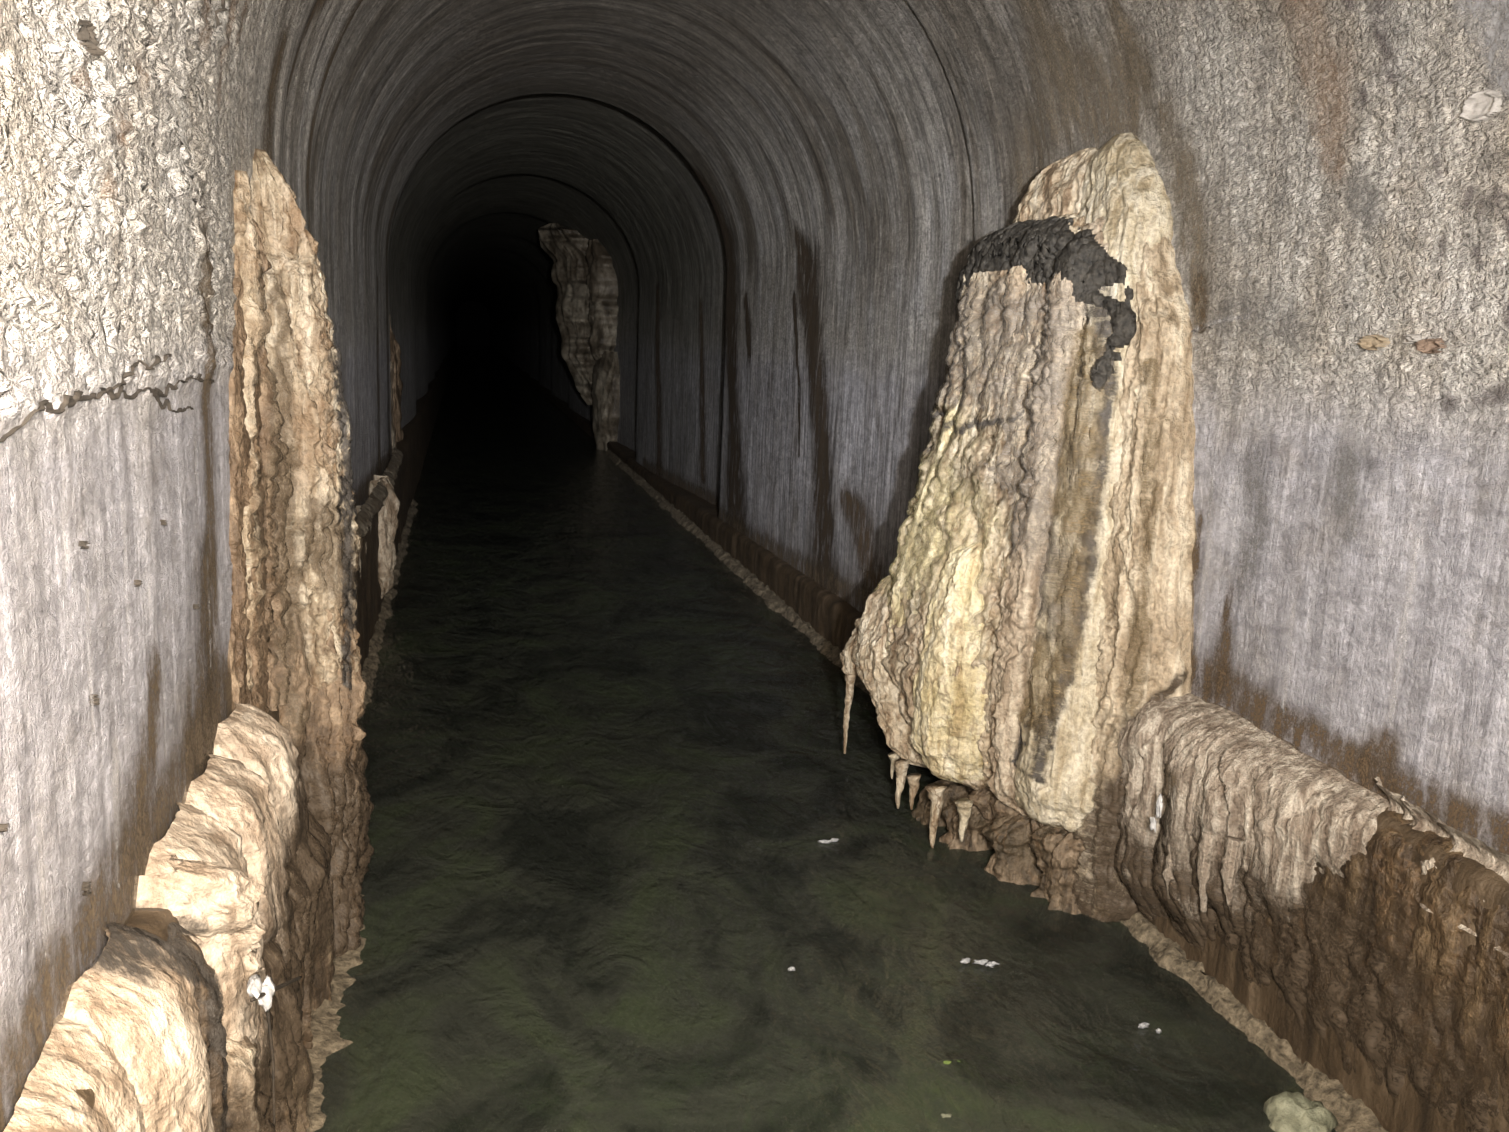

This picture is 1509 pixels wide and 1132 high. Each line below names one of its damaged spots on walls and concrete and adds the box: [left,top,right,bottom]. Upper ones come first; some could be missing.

leakage [263,0,324,160]
leakage [306,0,362,233]
crack [0,354,215,442]
leakage [0,227,335,1132]
leakage [331,200,404,690]
leakage [538,223,620,451]
leakage [792,227,838,595]
leakage [840,0,1509,1132]